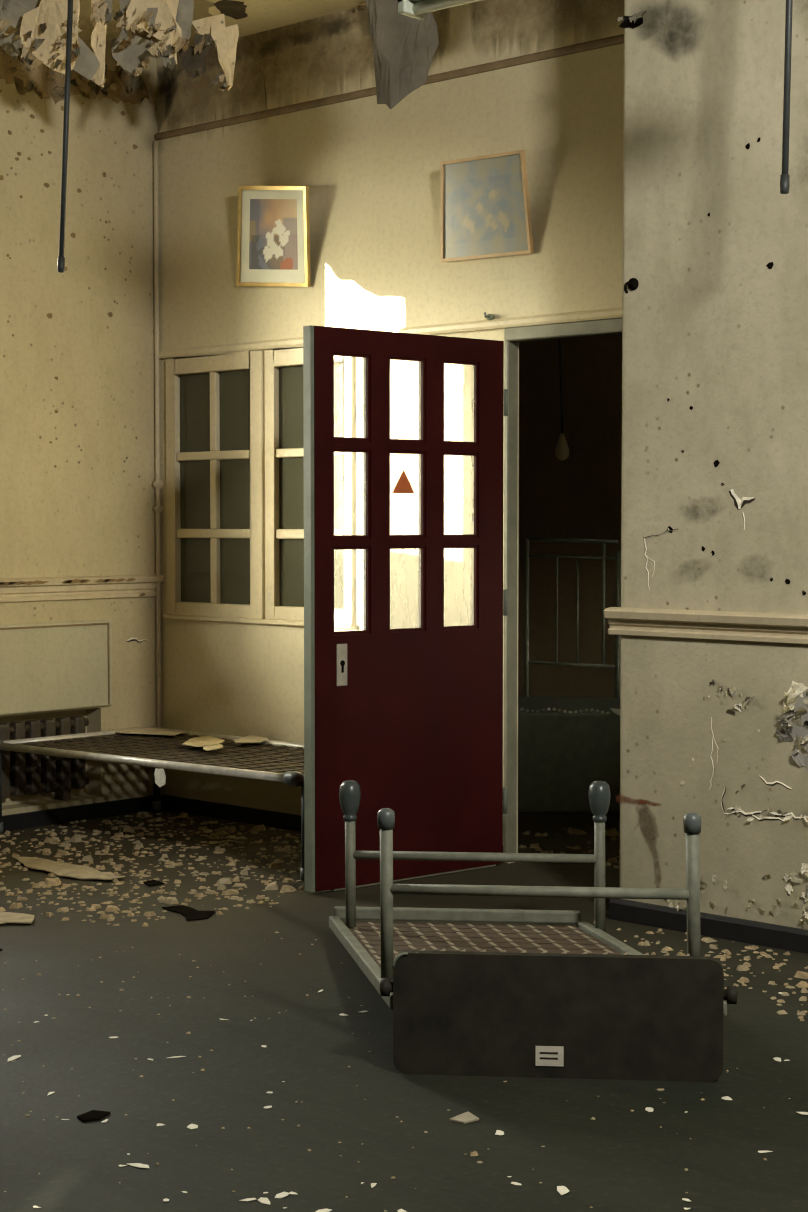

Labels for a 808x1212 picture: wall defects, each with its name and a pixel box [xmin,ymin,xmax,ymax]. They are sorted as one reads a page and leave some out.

peeling [0,0,439,116]
water stain [159,10,374,122]
water stain [433,9,447,52]
peeling [709,679,755,716]
peeling [775,681,808,770]
peeling [726,804,808,824]